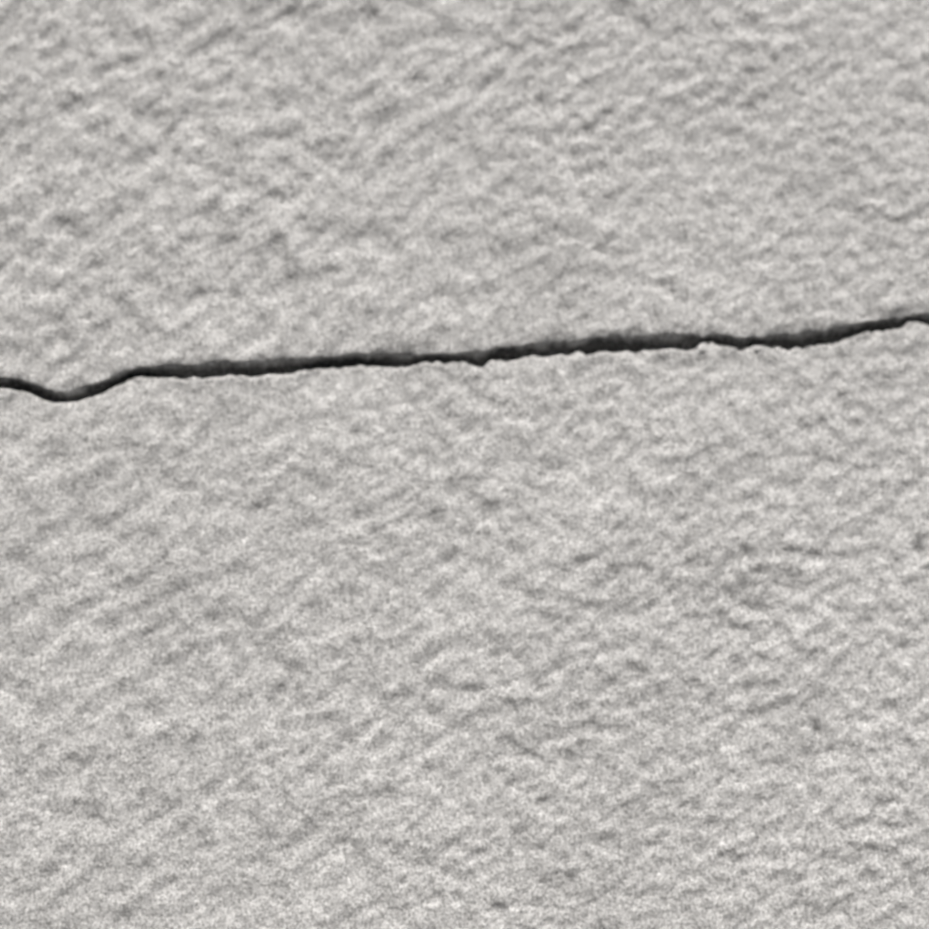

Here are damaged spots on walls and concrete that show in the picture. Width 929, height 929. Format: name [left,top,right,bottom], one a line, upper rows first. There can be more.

crack [0,318,929,403]